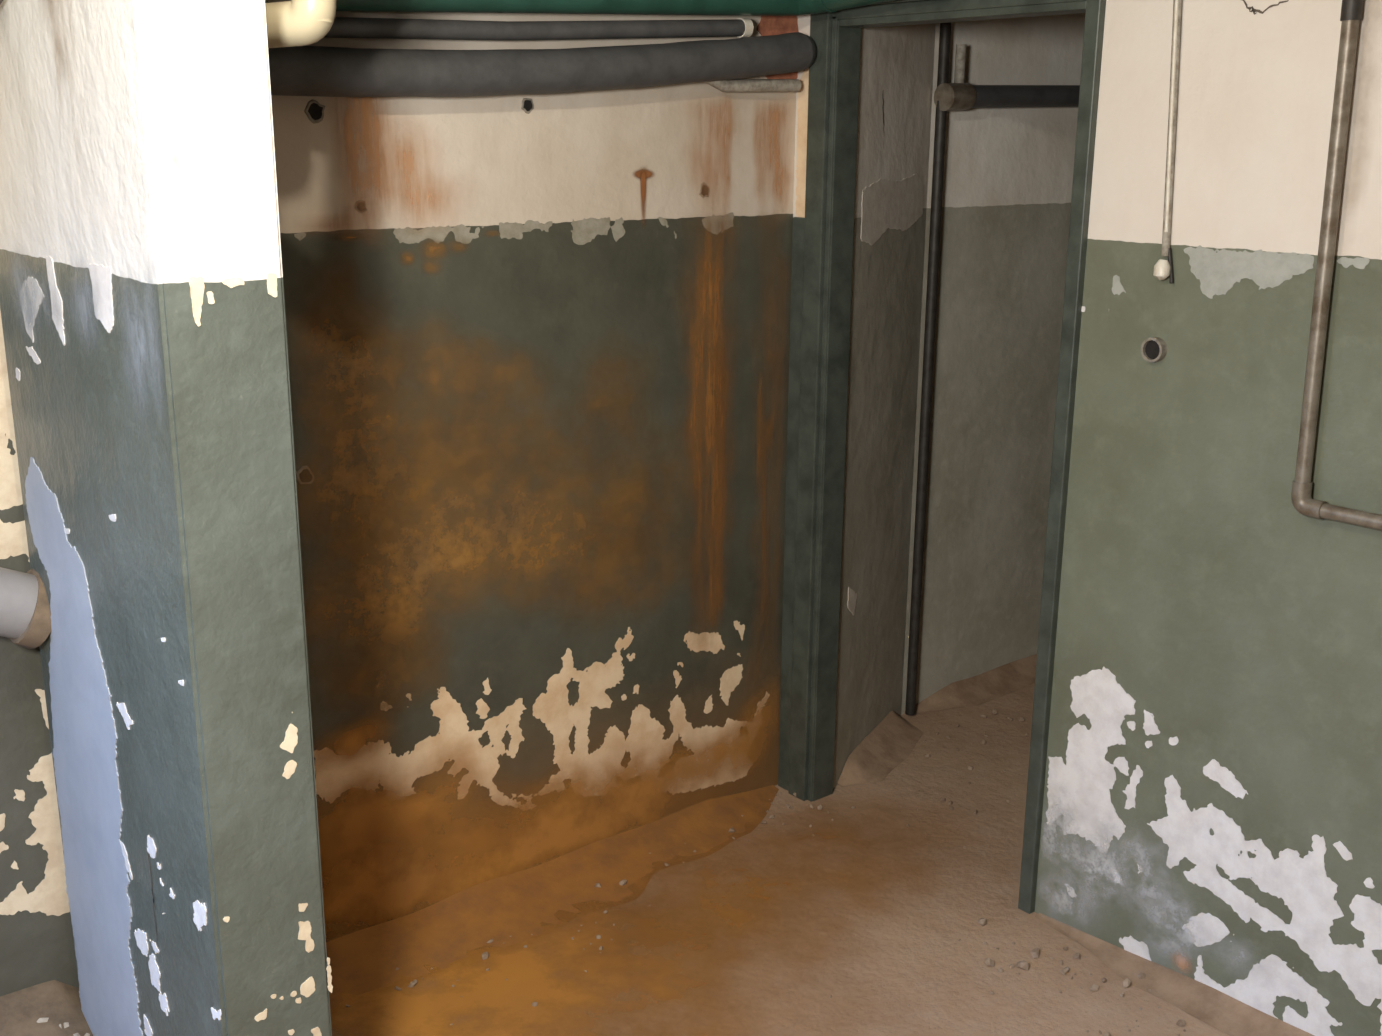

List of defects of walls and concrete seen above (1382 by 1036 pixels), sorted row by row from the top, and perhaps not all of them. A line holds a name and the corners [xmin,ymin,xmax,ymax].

corrosion [344,97,381,195]
corrosion [634,170,653,216]
peeling [189,276,244,327]
peeling [1184,245,1314,299]
peeling [0,256,170,1036]
peeling [280,712,298,779]
peeling [314,620,751,810]
corrosion [318,701,776,942]
peeling [1046,666,1179,853]
peeling [1203,759,1248,799]
peeling [254,903,333,1022]
peeling [1147,775,1382,1036]